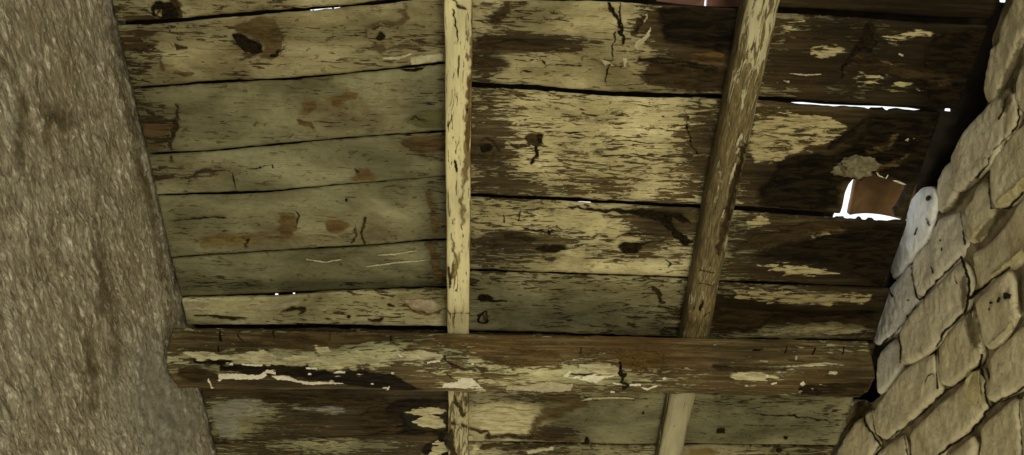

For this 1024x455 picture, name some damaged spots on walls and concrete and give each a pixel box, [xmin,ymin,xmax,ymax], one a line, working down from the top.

water stain [473,1,616,68]
crack [514,2,646,83]
peeling [718,110,847,184]
water stain [715,28,986,286]
peeling [733,287,872,306]
peeling [761,325,864,336]
peeling [183,345,390,390]
peeling [398,350,443,364]
peeling [442,362,666,401]
peeling [731,360,784,387]
peeling [791,356,842,396]